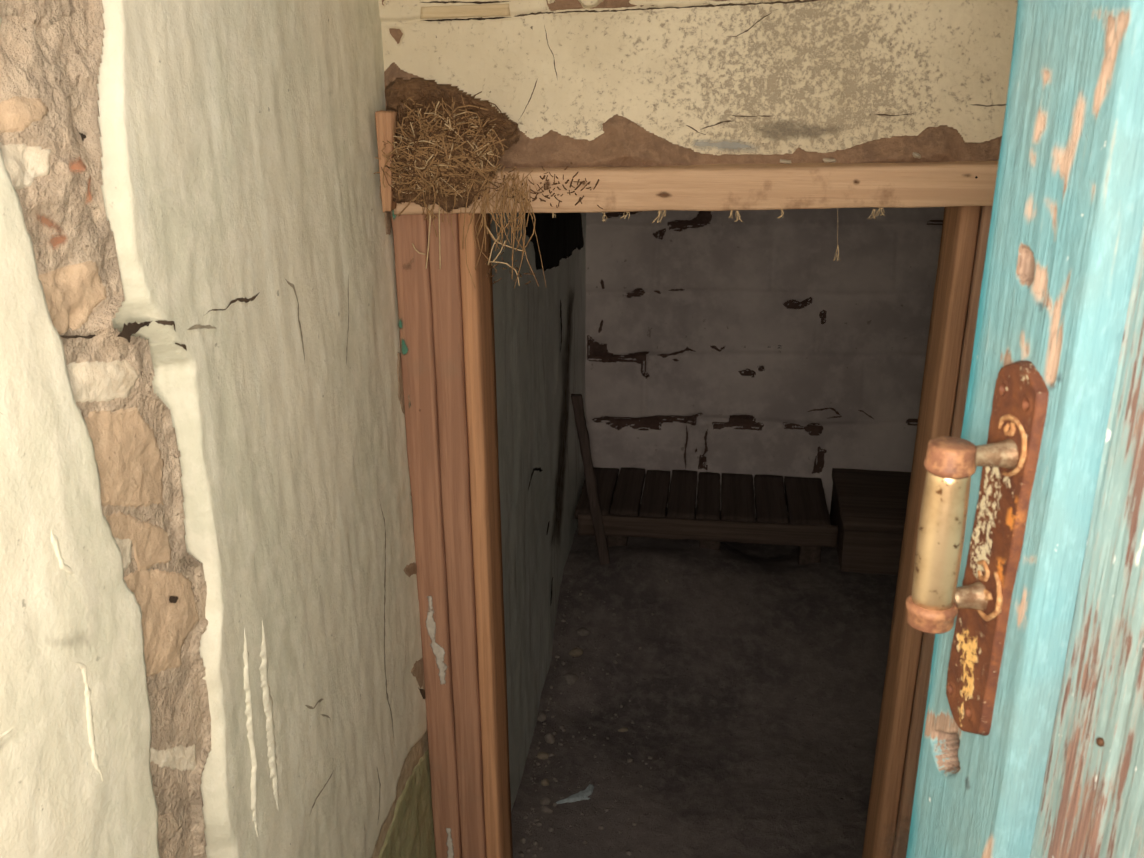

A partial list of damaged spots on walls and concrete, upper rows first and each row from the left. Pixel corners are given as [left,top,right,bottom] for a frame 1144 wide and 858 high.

peeling [546,0,654,11]
peeling [389,28,403,44]
peeling [652,211,712,240]
crack [60,292,260,351]
crack [284,278,305,361]
crack [343,275,351,364]
peeling [783,297,827,324]
peeling [587,335,650,379]
spalling [0,0,211,858]
peeling [592,413,764,431]
peeling [784,422,827,474]
flaking render [411,658,425,699]